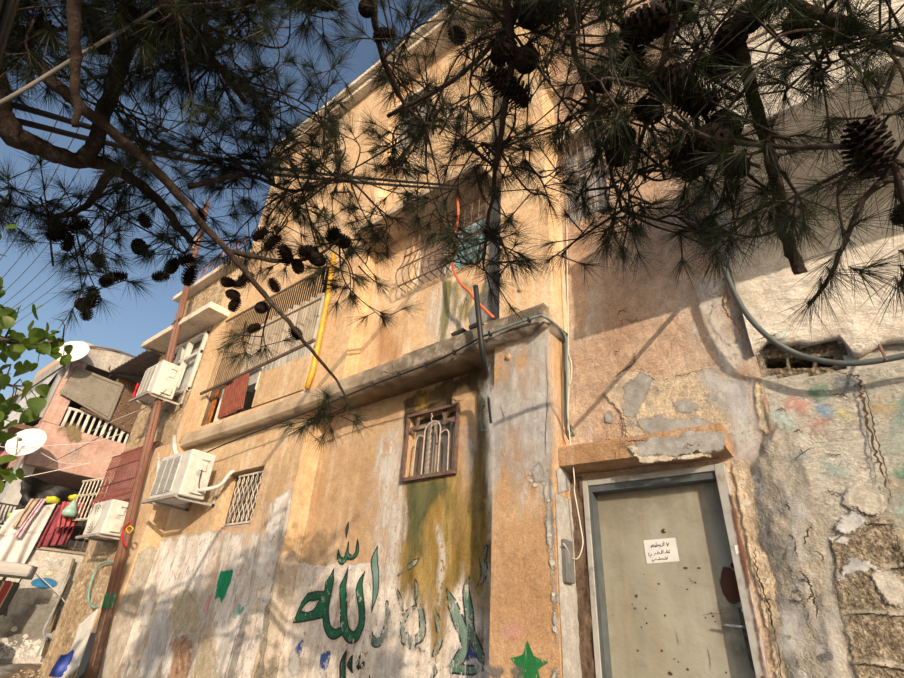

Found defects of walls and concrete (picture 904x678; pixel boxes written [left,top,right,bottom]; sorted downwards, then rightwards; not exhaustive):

water stain [374,365,497,652]
spalling [603,368,771,463]
crack [753,548,782,678]
crack [789,526,825,619]
crack [827,373,892,517]
spalling [828,517,904,678]